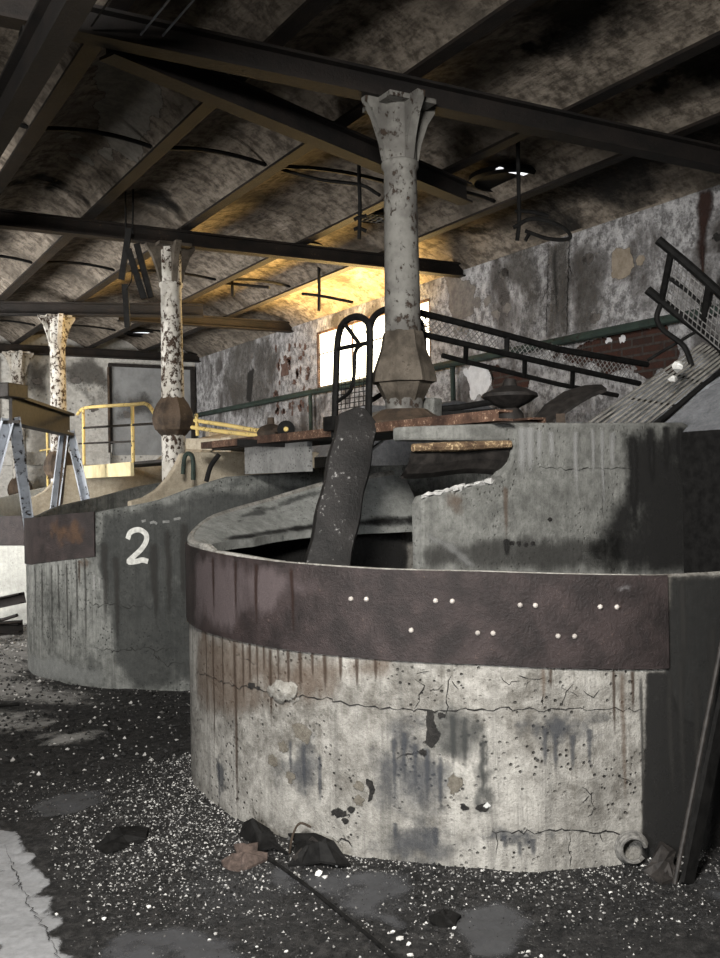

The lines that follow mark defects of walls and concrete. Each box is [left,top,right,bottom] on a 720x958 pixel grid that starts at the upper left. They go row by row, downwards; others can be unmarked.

peeling [611,247,645,280]
spalling [421,478,494,499]
leakage [427,427,720,861]
crack [295,671,644,718]
spalling [419,710,446,757]
leakage [290,743,321,793]
leakage [381,712,489,805]
leakage [394,823,444,857]